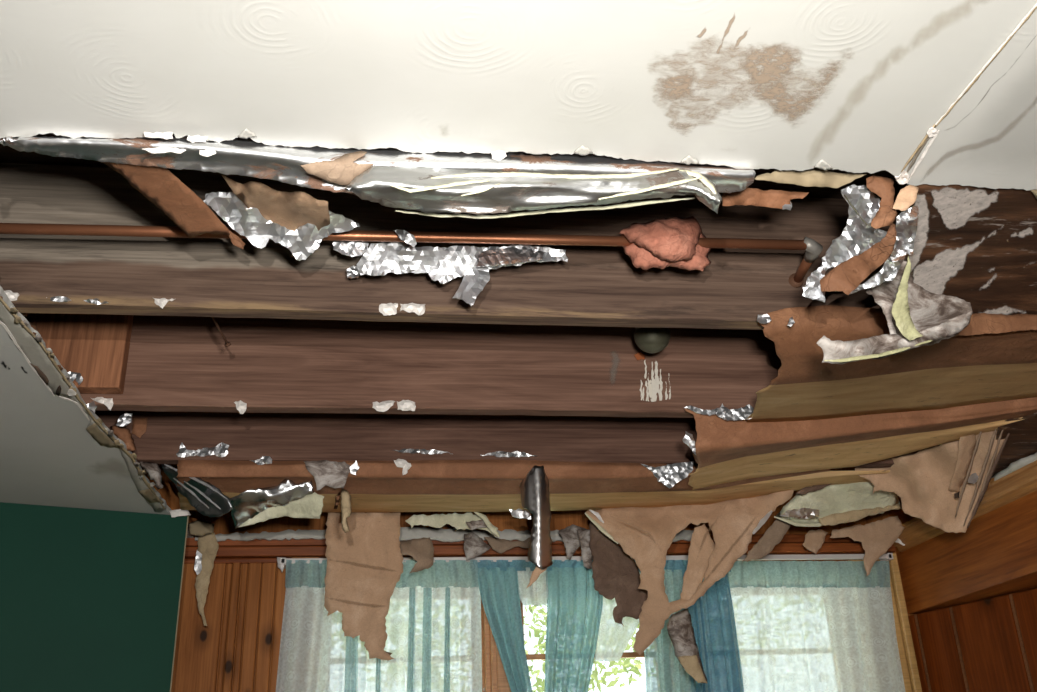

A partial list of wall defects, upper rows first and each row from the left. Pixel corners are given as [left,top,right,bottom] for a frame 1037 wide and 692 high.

leakage [659,16,835,127]
spalling [238,129,257,139]
flaking render [142,132,216,157]
flaking render [491,150,506,161]
spalling [574,145,593,155]
spalling [680,155,699,165]
spalling [895,170,909,184]
peeling [1,296,77,396]
peeling [86,418,140,467]